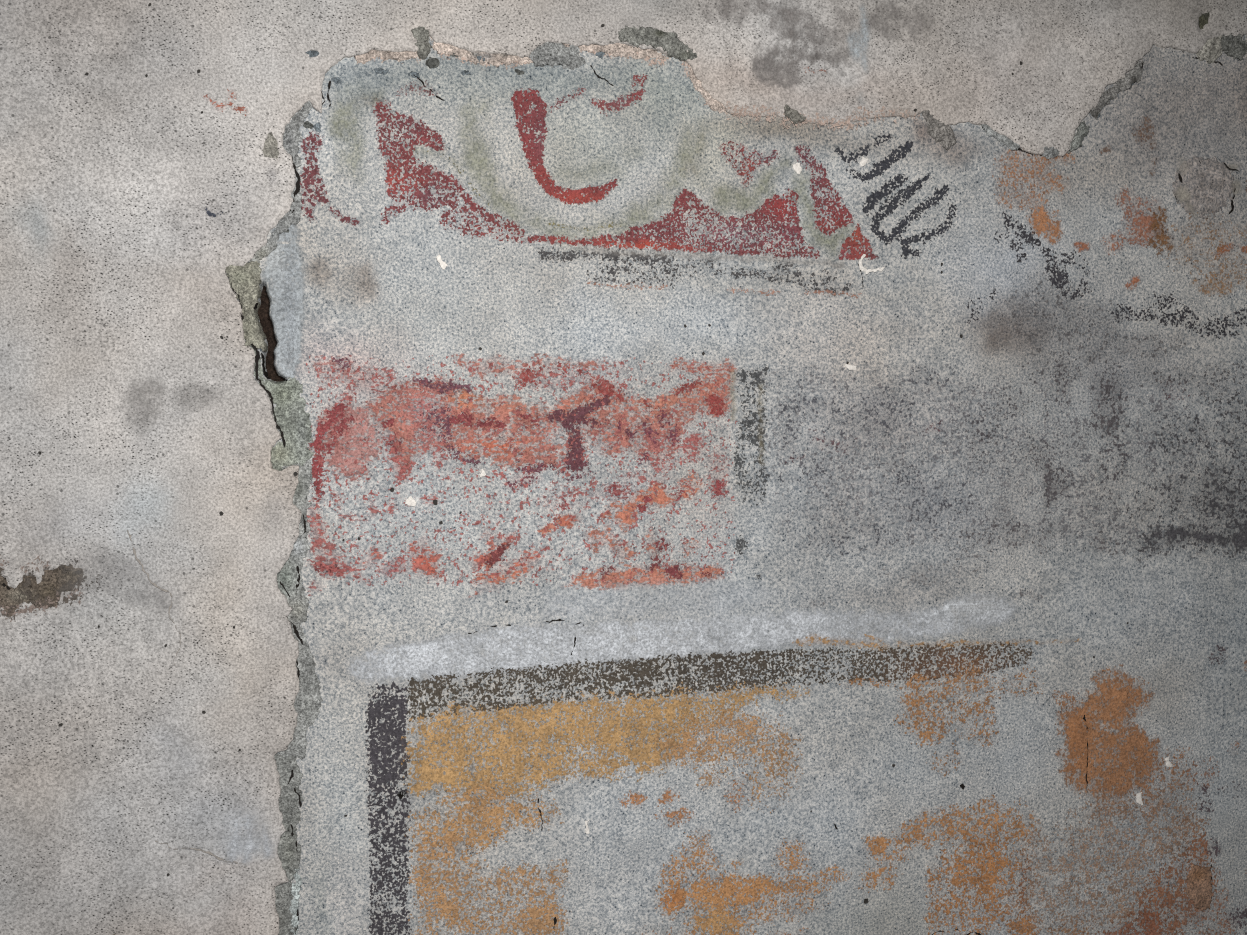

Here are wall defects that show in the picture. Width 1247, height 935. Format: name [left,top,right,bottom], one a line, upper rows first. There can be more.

spalling [354,50,421,64]
spalling [430,37,534,70]
spalling [564,43,920,131]
spalling [262,132,279,160]
spalling [858,254,885,274]
spalling [225,224,314,476]
spalling [0,555,103,622]
peeling [1185,864,1213,911]